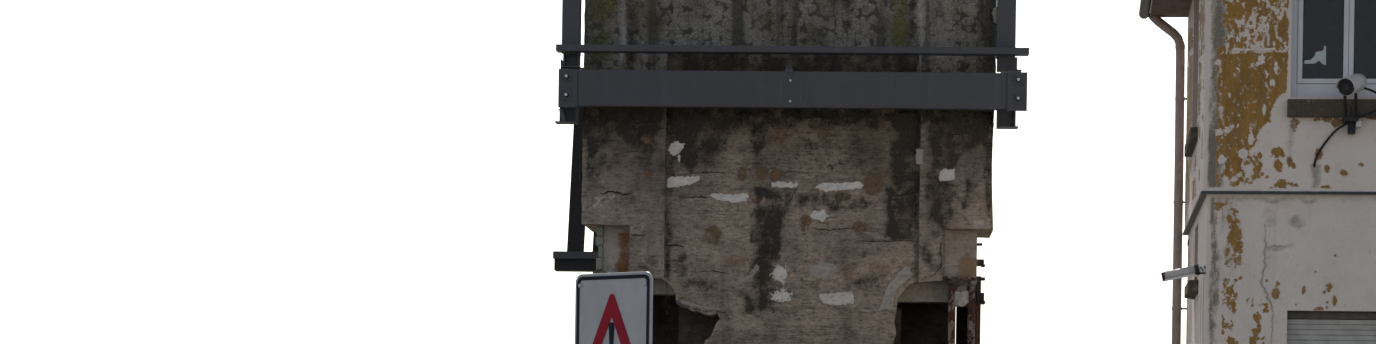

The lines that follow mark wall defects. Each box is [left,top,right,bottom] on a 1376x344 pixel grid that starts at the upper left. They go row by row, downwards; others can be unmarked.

peeling [1290,117,1344,132]
peeling [1184,0,1299,344]
damp [583,107,994,313]
rust [617,233,629,272]
peeling [1295,271,1337,310]